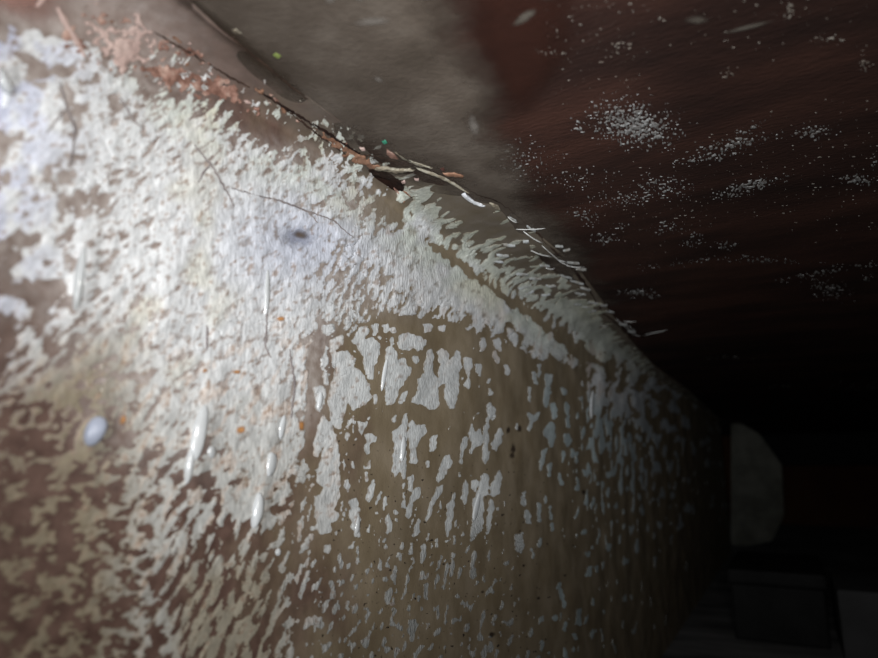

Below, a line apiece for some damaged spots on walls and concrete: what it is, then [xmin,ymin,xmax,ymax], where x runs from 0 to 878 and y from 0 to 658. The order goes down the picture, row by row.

crack [194,144,354,238]
crack [155,0,398,163]
peeling [53,3,723,658]
water stain [192,0,837,284]
crack [421,167,654,364]
water stain [832,158,878,186]